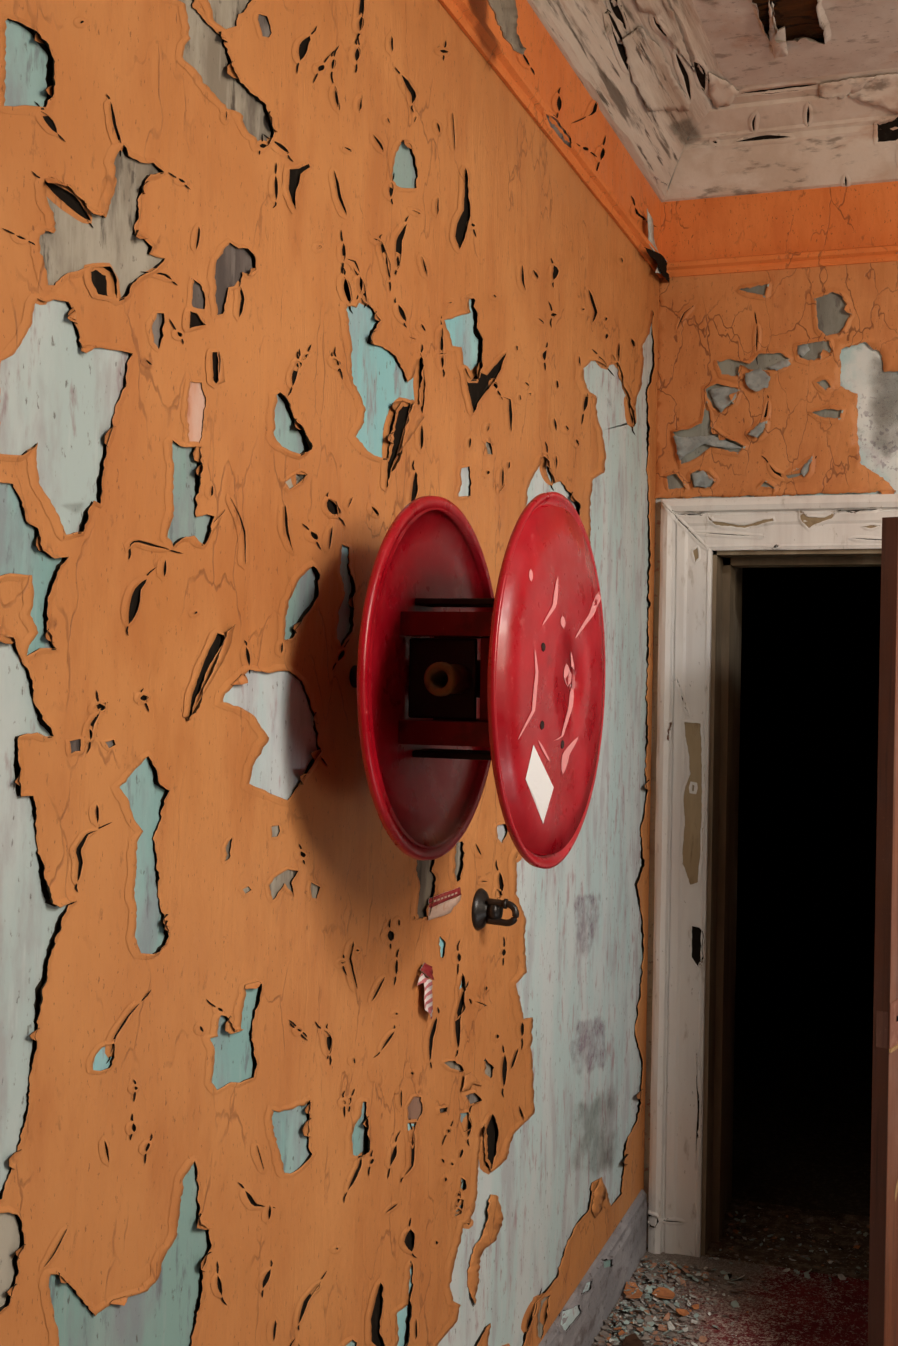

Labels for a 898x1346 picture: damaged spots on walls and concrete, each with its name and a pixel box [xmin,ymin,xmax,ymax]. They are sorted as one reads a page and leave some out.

peeling [0,12,57,116]
peeling [162,0,278,153]
spalling [747,0,831,44]
peeling [187,238,260,319]
peeling [160,352,225,550]
peeling [266,388,313,493]
peeling [338,295,428,472]
peeling [0,139,172,1315]
peeling [192,624,324,806]
peeling [403,209,898,1346]
peeling [202,979,265,1095]
peeling [39,1155,215,1346]